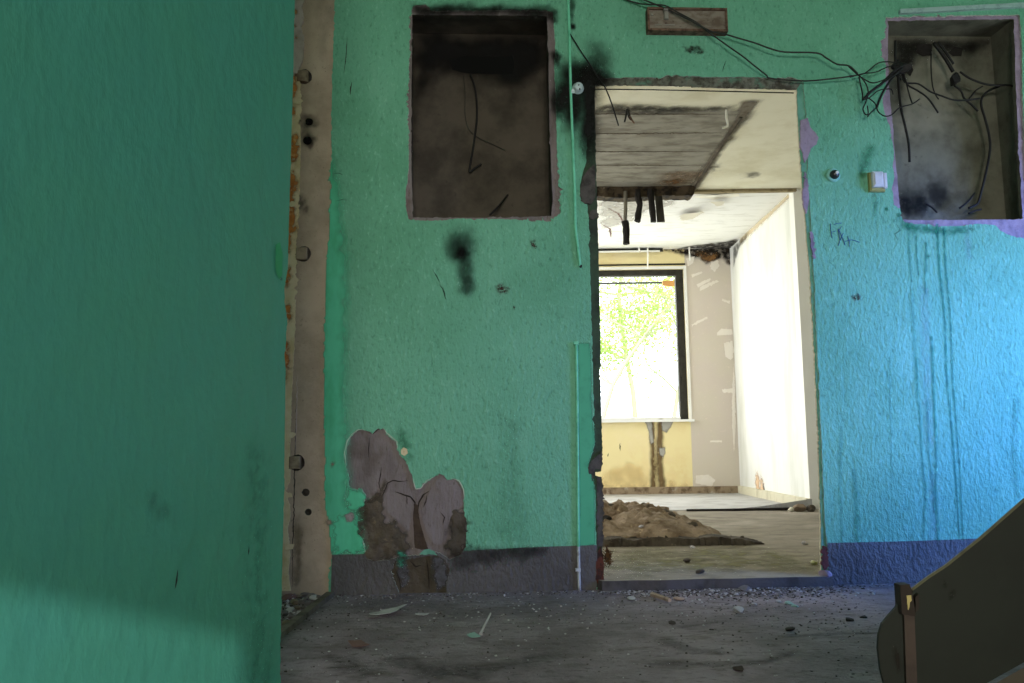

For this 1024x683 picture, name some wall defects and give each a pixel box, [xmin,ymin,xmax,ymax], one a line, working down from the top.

spalling [799,118,819,214]
leakage [885,208,966,540]
spalling [333,428,468,610]